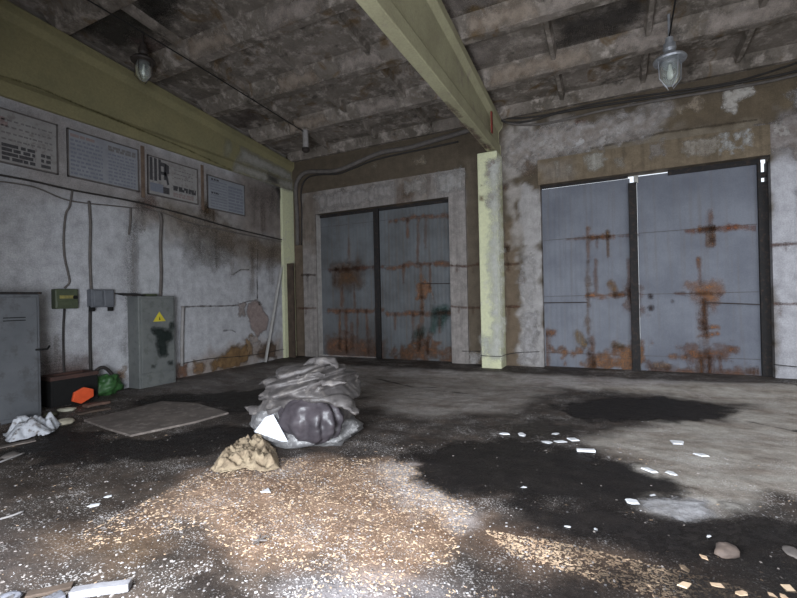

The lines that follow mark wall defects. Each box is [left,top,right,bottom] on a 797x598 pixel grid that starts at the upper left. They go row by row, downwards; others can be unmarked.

rust [687,215,746,247]
rust [328,215,479,352]
rust [585,269,653,310]
rust [678,283,721,339]
spalling [176,301,277,379]
rust [546,320,758,375]